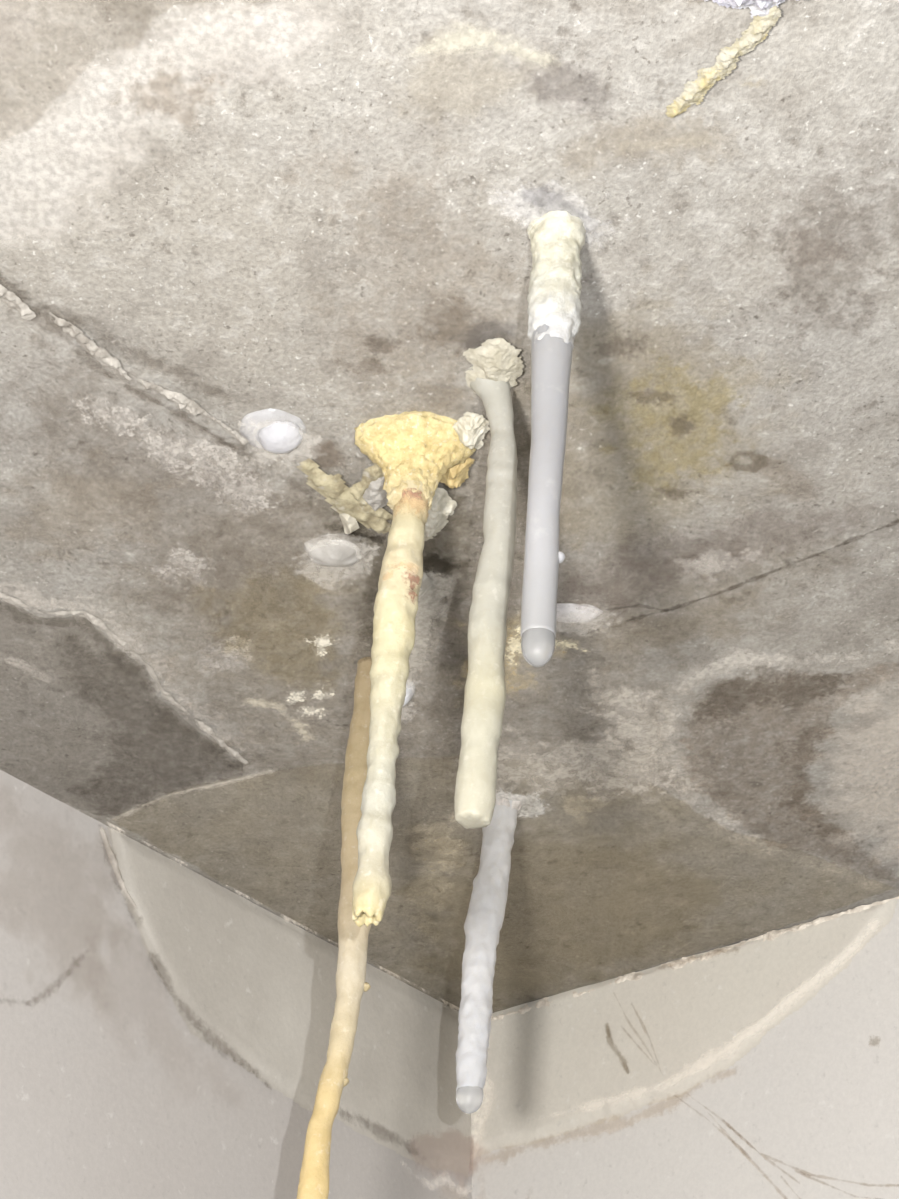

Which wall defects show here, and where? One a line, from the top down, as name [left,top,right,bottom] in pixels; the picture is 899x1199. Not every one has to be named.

crack [0,284,249,445]
crack [674,571,774,609]
peeling [0,592,249,764]